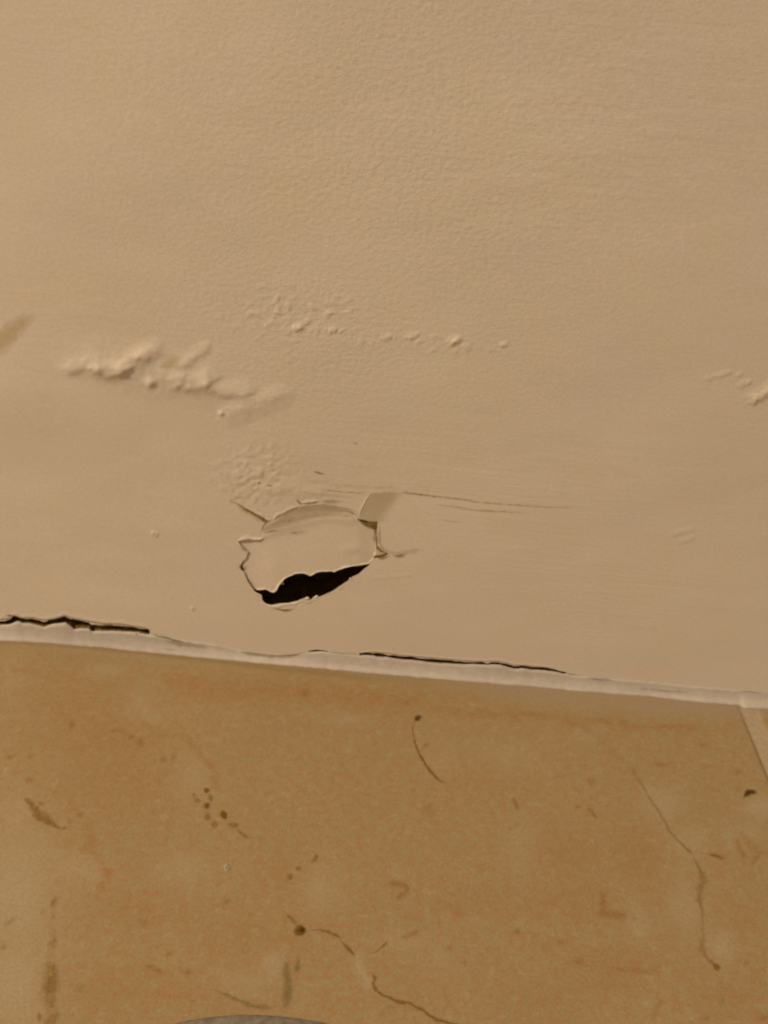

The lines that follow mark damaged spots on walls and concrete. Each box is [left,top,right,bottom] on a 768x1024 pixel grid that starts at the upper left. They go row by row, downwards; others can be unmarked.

flaking render [237,491,404,611]
crack [0,611,178,641]
crack [287,649,566,674]